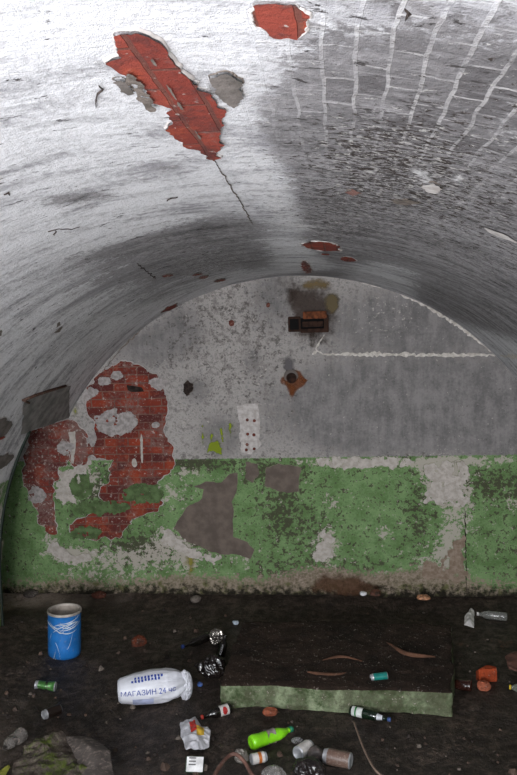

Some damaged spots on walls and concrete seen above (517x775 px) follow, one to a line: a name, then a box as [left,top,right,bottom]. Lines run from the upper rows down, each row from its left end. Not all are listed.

flaking render [248,2,313,40]
flaking render [103,27,245,161]
crack [215,161,253,225]
flaking render [301,241,358,262]
leakage [289,279,339,321]
rust [281,370,307,396]
flaking render [0,360,176,565]
flaking render [161,461,301,565]